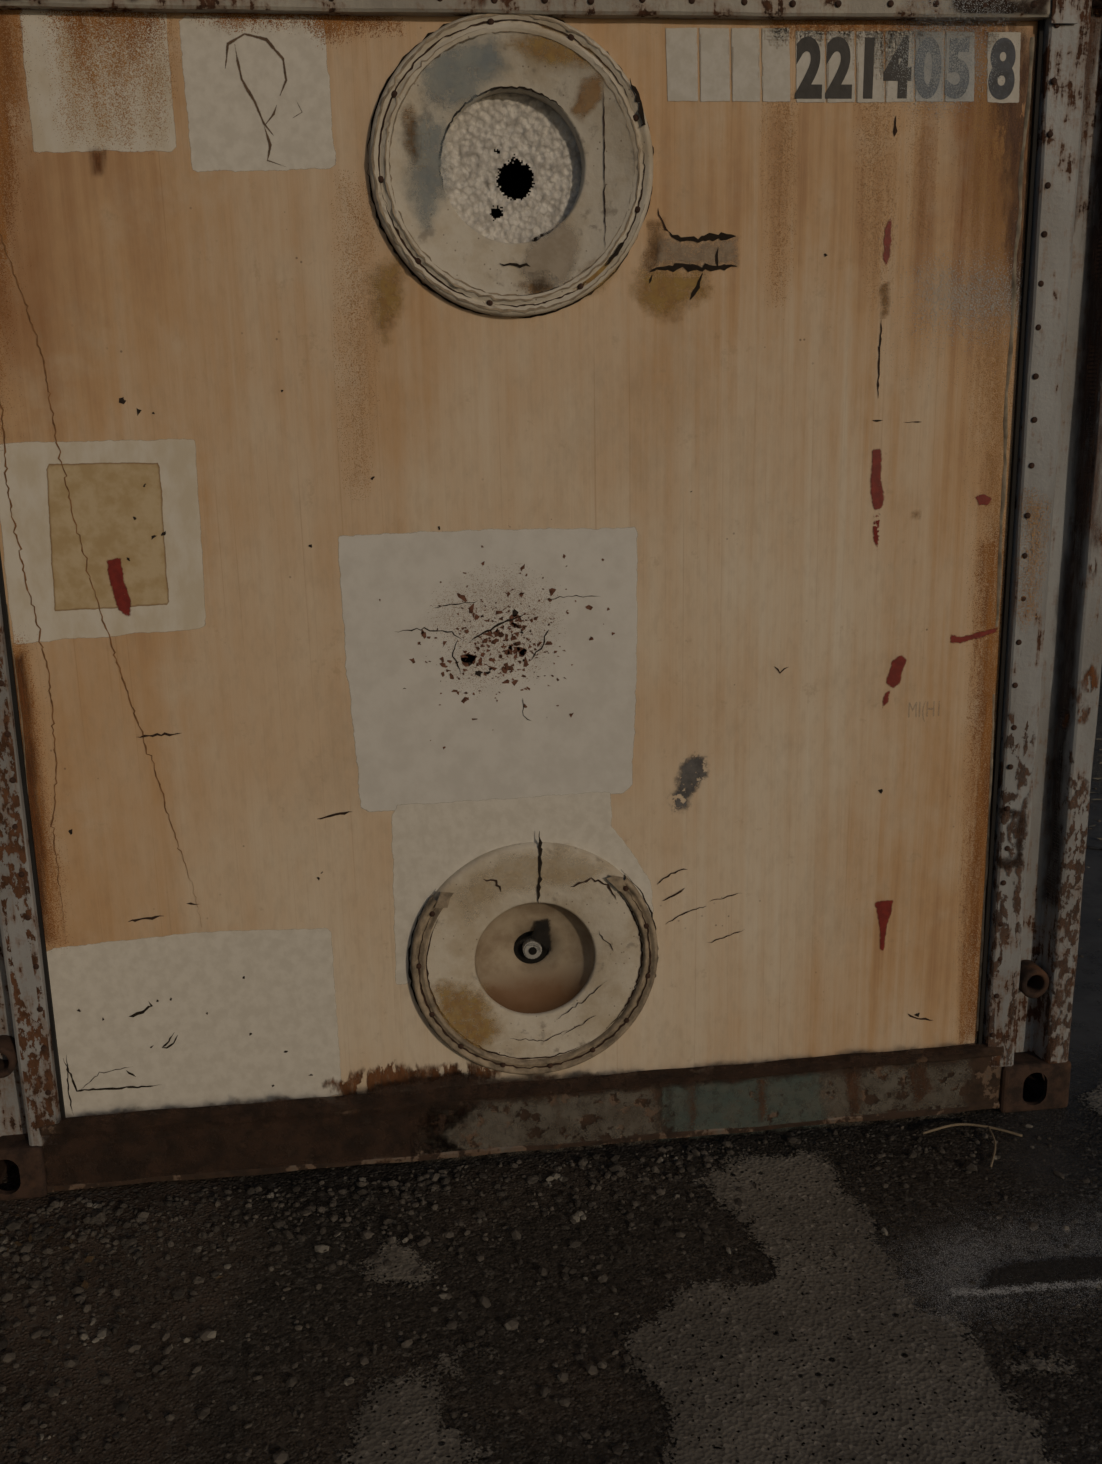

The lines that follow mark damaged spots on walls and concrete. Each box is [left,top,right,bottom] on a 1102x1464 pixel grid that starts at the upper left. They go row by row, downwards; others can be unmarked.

rust [0,0,405,437]
rust [403,109,417,155]
rust [518,37,602,115]
rust [639,222,705,313]
rust [761,0,1049,77]
rust [998,36,1030,291]
rust [1043,15,1102,904]
rust [11,631,69,948]
rust [58,488,1051,1137]
crack [537,831,616,904]